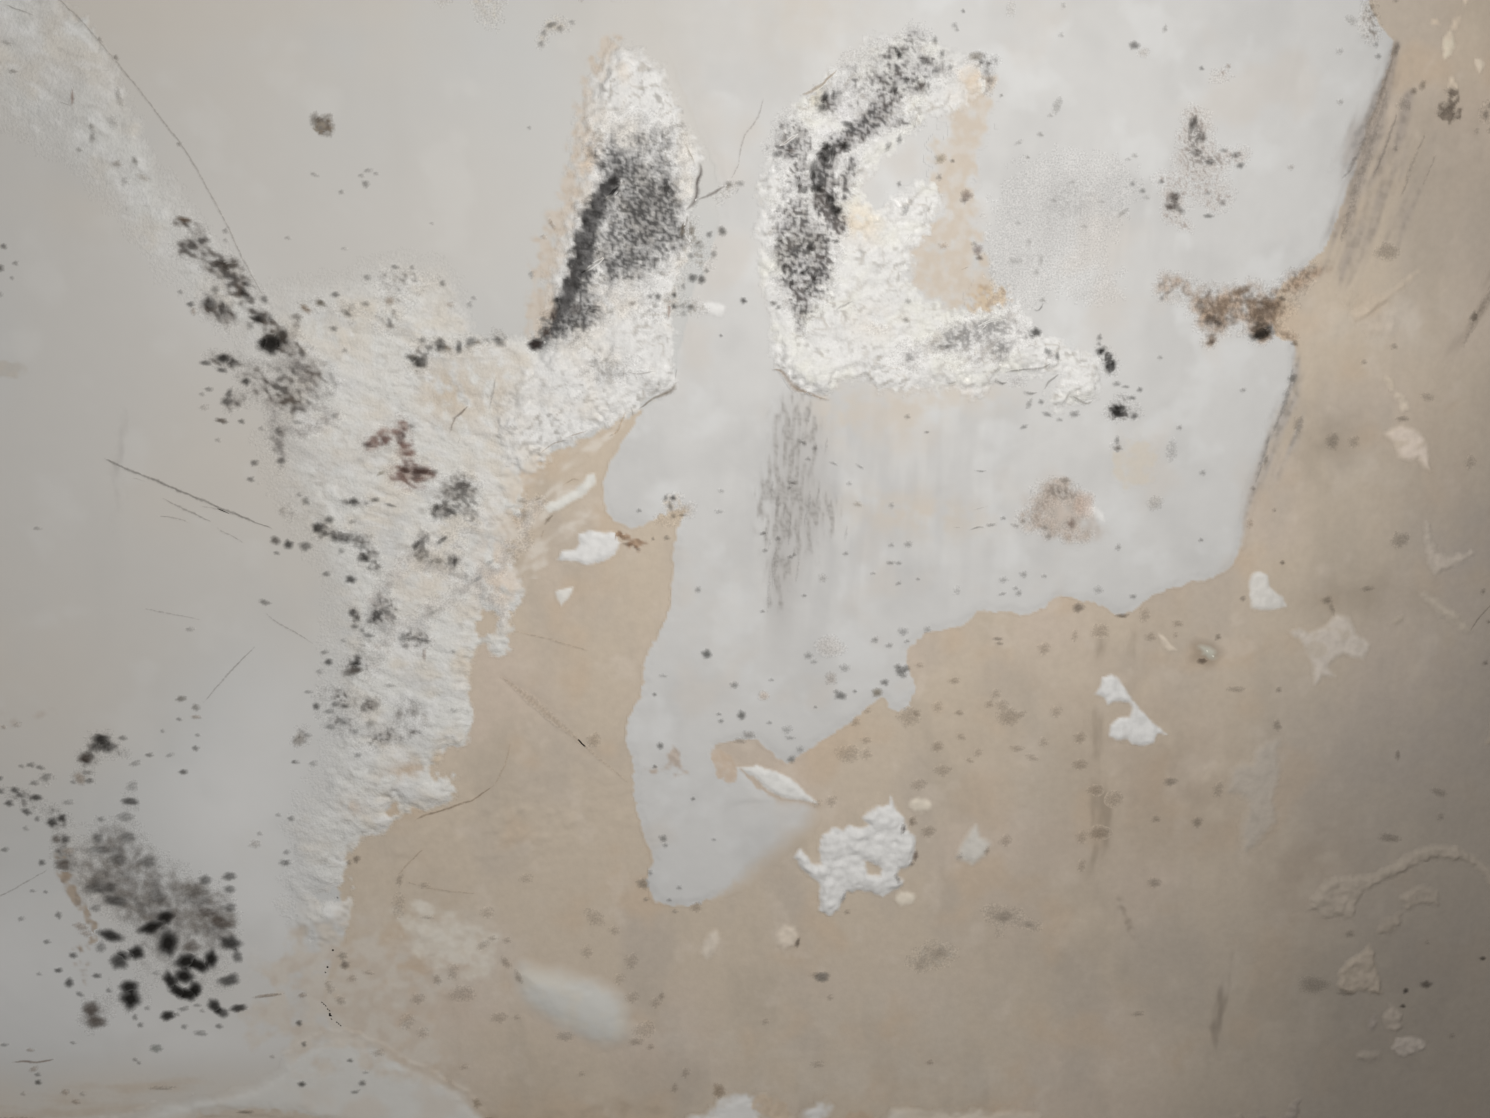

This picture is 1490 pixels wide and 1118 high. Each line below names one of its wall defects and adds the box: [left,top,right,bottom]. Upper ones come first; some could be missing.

flaking render [0,0,266,359]
leakage [0,695,339,1118]
flaking render [248,246,535,926]
leakage [269,411,548,767]
leakage [168,103,746,483]
leakage [636,488,725,541]
leakage [700,648,713,660]
leakage [803,625,933,764]
flaking render [335,0,1490,1118]
leakage [895,700,983,791]
leakage [760,8,1254,430]
leakage [1150,260,1320,491]